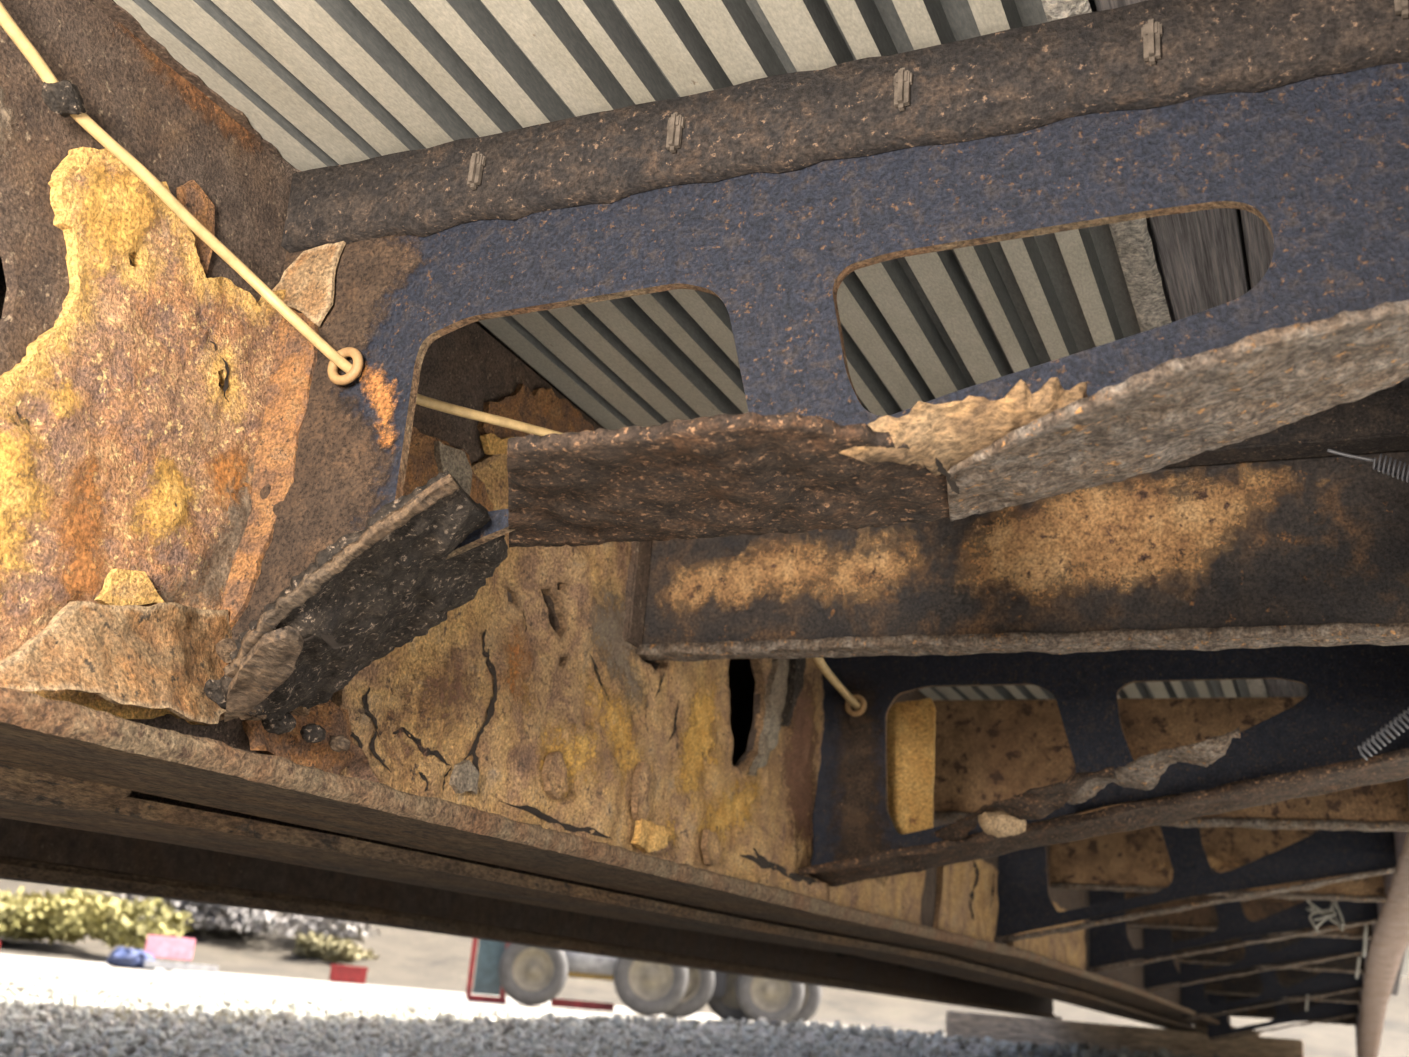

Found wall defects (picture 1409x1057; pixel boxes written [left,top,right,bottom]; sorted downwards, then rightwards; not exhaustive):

rust [0,92,12,155]
rust [0,147,1088,970]
rust [958,465,1290,609]
crack [351,629,611,838]
rust [935,727,1241,842]